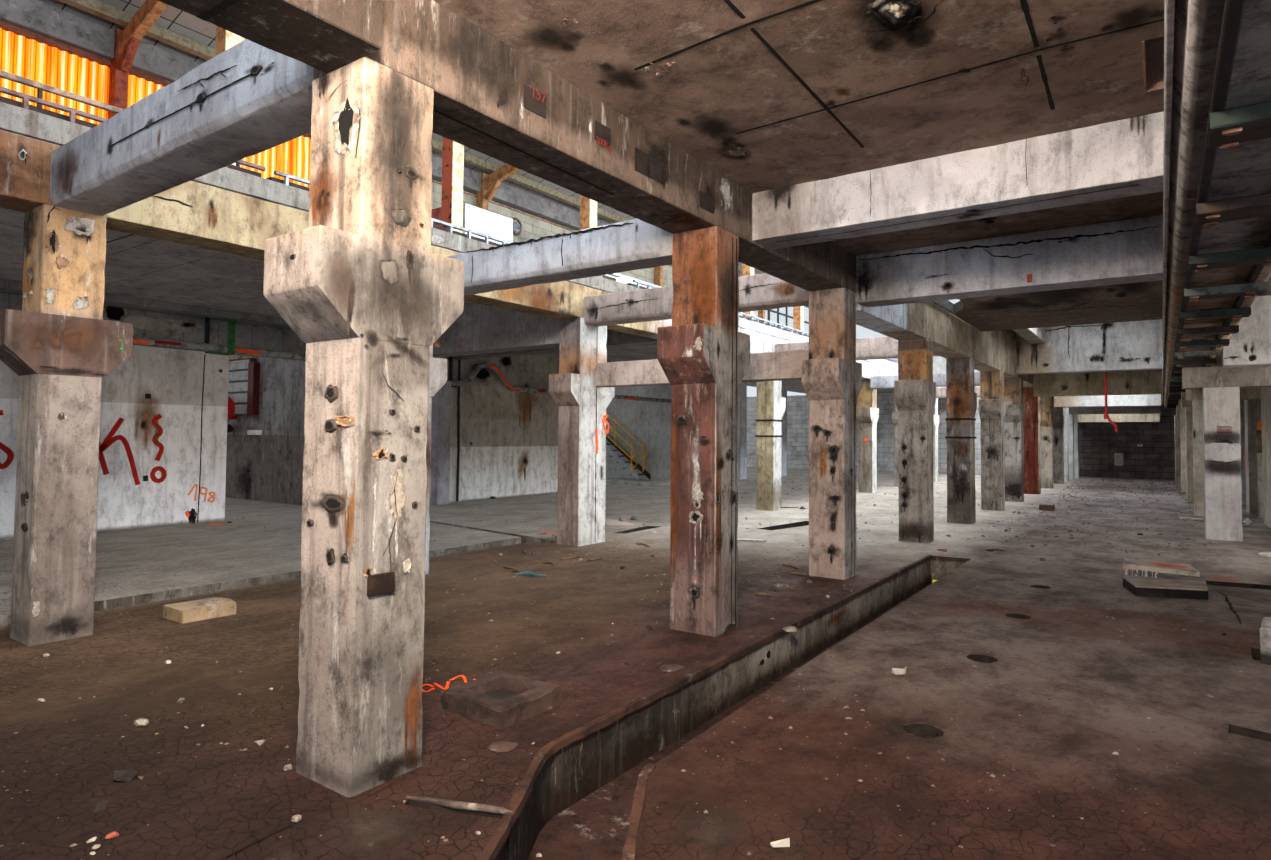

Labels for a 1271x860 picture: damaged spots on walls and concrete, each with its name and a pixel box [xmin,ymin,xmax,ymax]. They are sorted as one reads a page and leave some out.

crack [109,65,253,148]
crack [777,138,1158,260]
spalling [403,558,412,573]
corrosion [405,675,421,755]